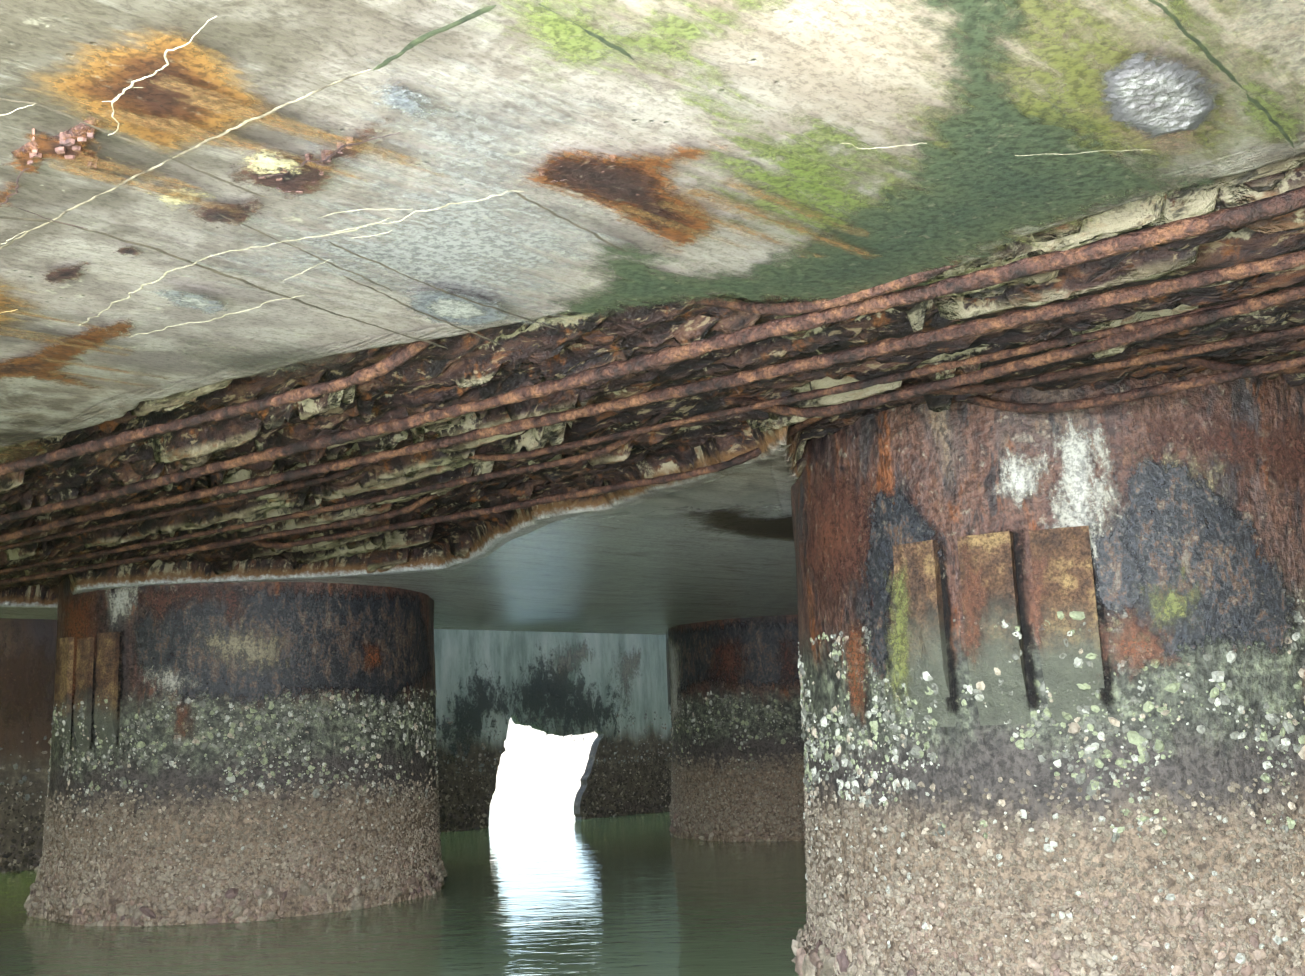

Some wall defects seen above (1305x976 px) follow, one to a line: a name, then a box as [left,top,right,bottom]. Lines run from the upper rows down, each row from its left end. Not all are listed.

crack [0,168,88,245]
crack [102,16,217,135]
rust [0,33,437,228]
crack [78,191,524,338]
crack [261,131,401,178]
rust [527,145,872,257]
rust [0,285,164,389]
spalling [0,132,1305,710]
efflorescence [1041,422,1122,559]
rust [1024,554,1051,647]
damp [437,639,640,769]
rust [844,620,869,723]